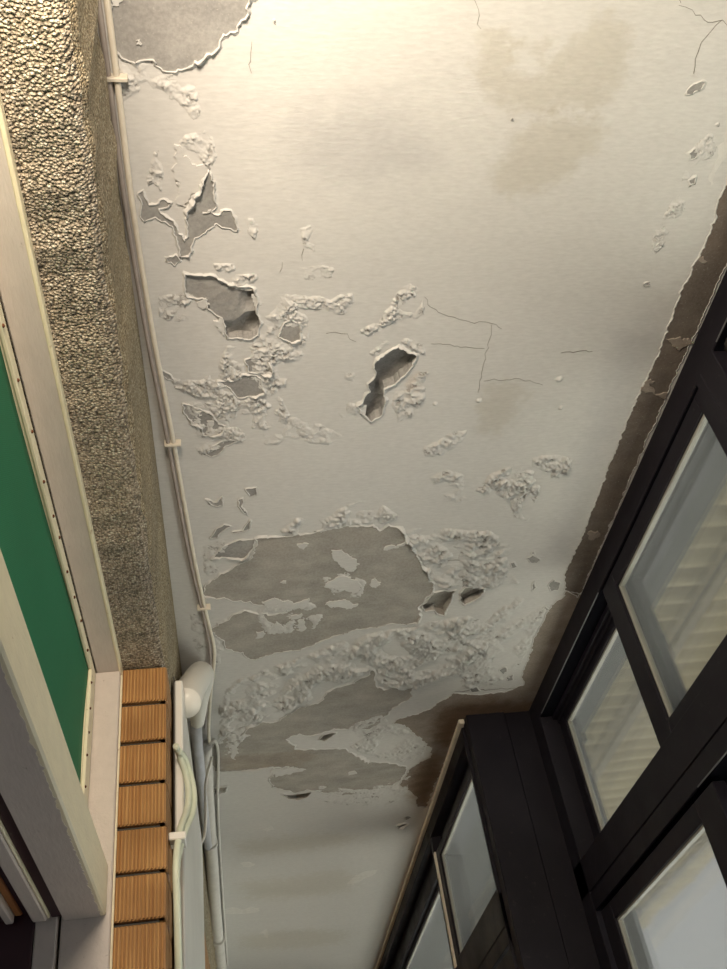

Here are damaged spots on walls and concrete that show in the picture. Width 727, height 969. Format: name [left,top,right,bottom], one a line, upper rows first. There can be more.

peeling [102,0,257,120]
spalling [684,80,707,96]
crack [679,1,727,74]
spalling [681,122,720,189]
spalling [136,130,356,458]
crack [428,305,542,391]
peeling [189,178,727,830]